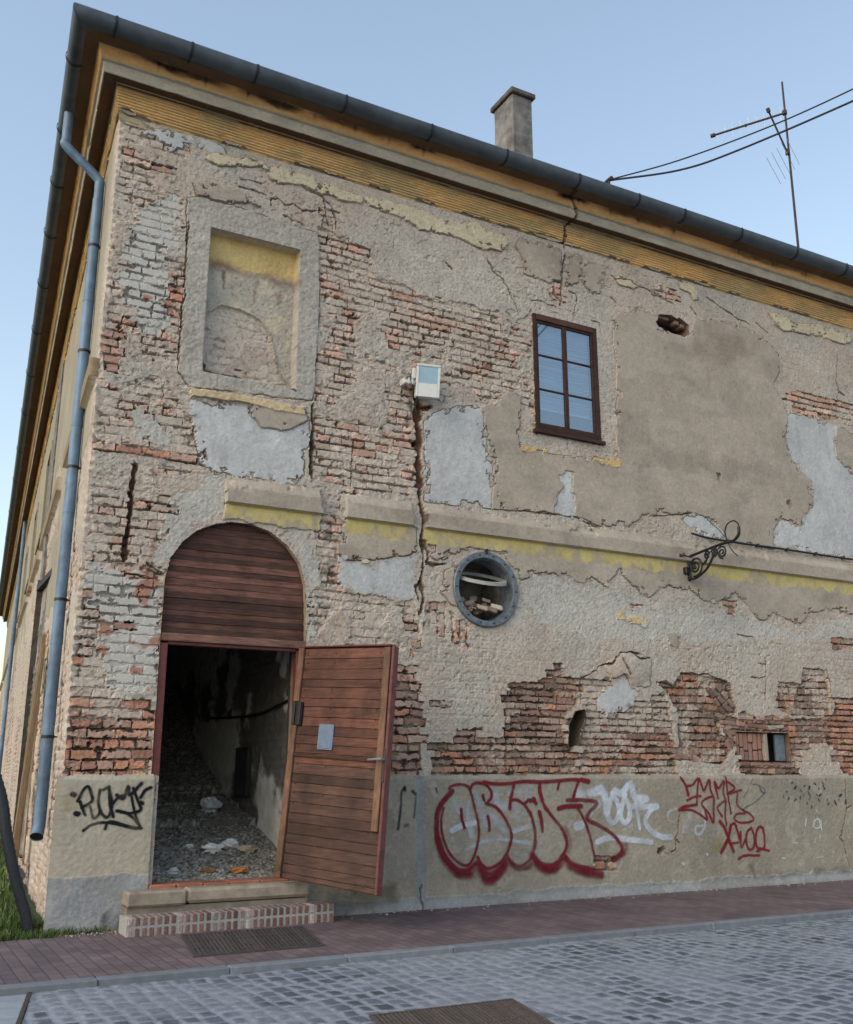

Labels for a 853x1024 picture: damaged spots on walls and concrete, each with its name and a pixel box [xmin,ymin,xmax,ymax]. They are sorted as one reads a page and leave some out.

peeling [122,129,509,281]
crack [487,190,768,334]
spalling [100,311,139,374]
spalling [203,305,286,383]
spalling [373,292,510,377]
peeling [92,398,311,484]
peeling [424,307,853,558]
spalling [86,494,181,538]
crack [120,462,165,576]
crack [410,391,447,616]
spalling [113,619,138,631]
spalling [224,501,853,775]